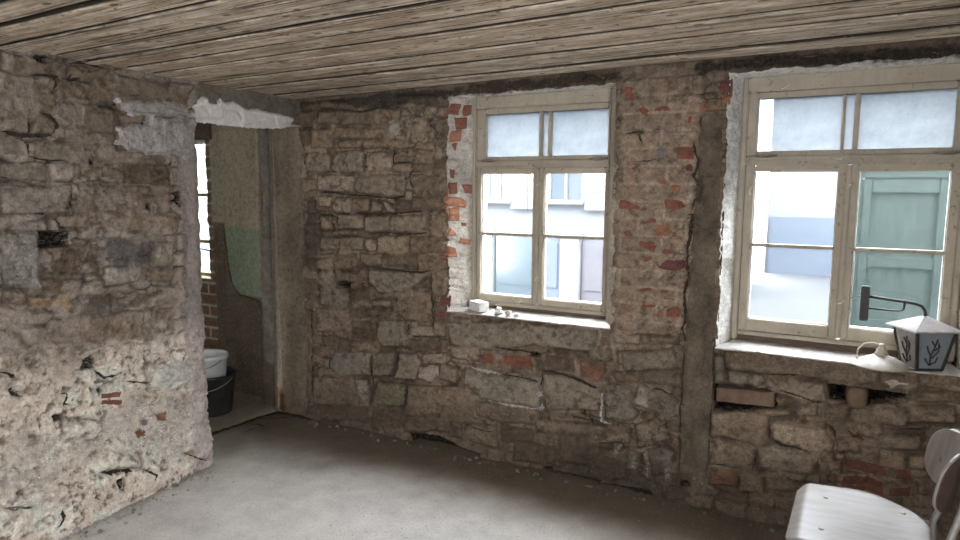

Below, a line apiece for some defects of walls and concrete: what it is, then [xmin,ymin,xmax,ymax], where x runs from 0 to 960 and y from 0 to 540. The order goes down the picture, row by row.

peeling [112,96,294,160]
spalling [444,104,472,152]
spalling [443,169,472,259]
crack [654,118,703,473]
crack [0,372,22,397]
crack [93,369,152,407]
crack [4,504,33,512]
crack [80,468,158,501]